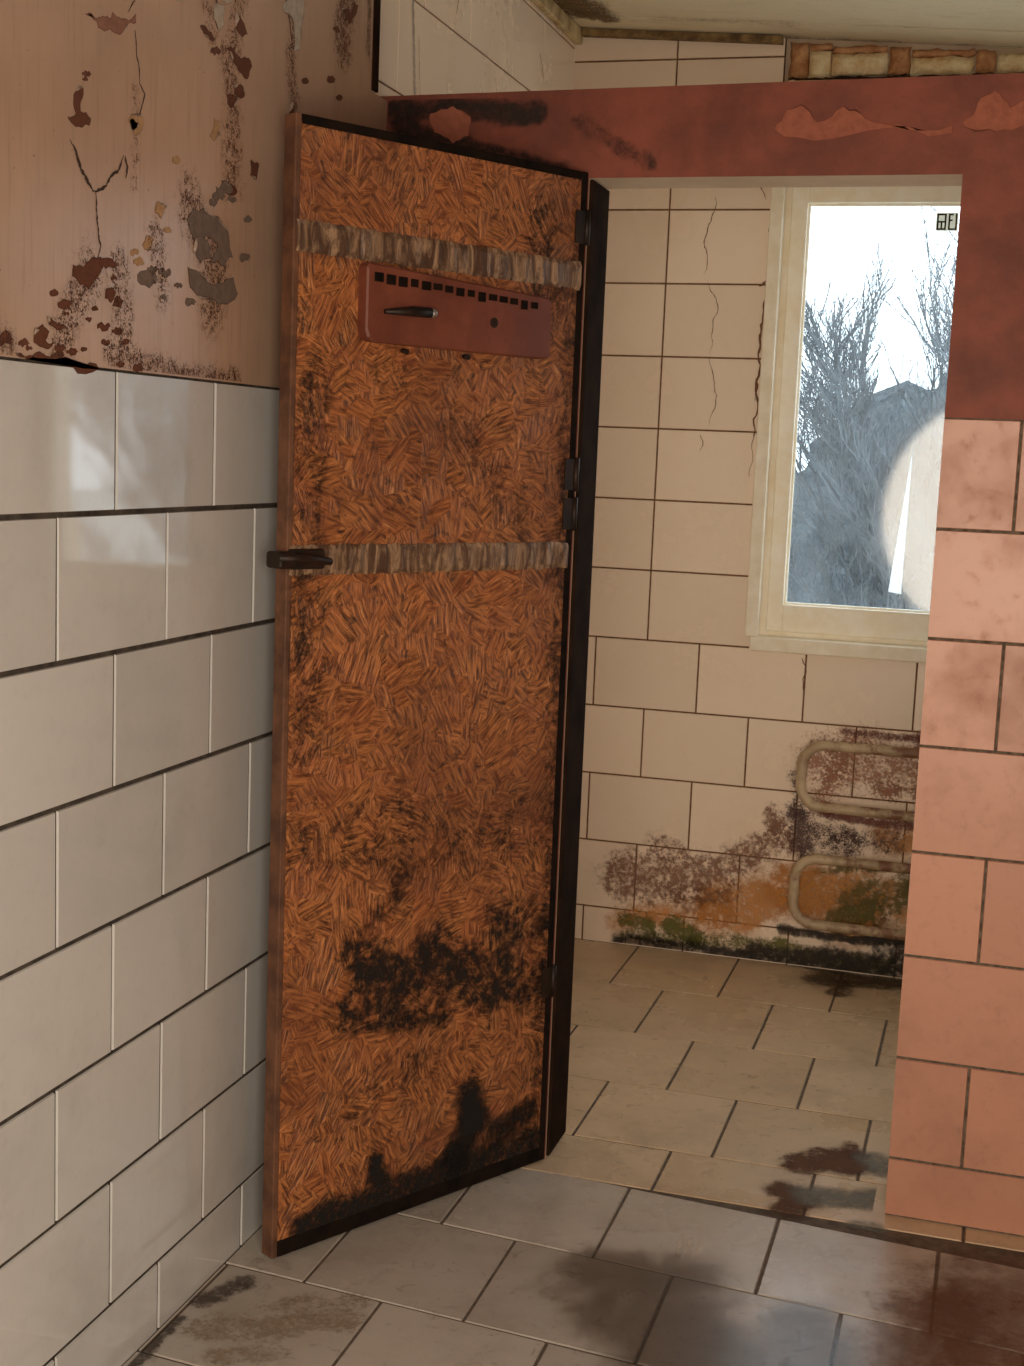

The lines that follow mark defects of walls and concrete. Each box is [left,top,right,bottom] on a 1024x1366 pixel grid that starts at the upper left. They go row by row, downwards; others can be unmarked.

peeling [282,0,309,114]
peeling [327,0,359,101]
mould [553,0,619,23]
peeling [0,0,259,382]
crack [700,198,718,450]
crack [749,281,766,471]
water stain [289,568,564,1237]
water stain [601,771,902,911]
corrosion [614,864,908,937]
water stain [739,924,905,975]
corrosion [806,729,921,853]
water stain [766,1144,889,1231]